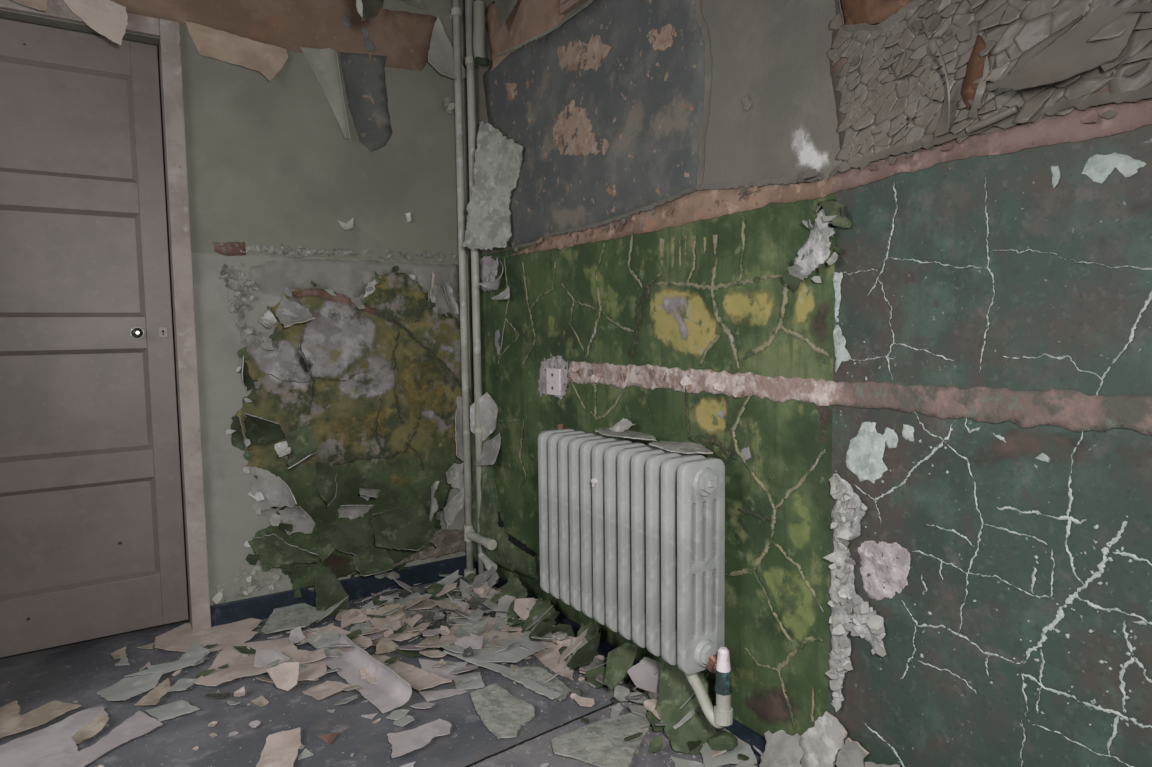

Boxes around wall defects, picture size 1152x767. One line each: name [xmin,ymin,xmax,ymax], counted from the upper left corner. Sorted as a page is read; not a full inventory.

flaking render [63,0,467,152]
water stain [251,301,444,428]
spalling [212,0,1152,643]
water stain [695,399,726,433]
water stain [650,289,774,355]
water stain [795,281,827,341]
crack [497,178,1152,767]
spalling [800,422,932,767]